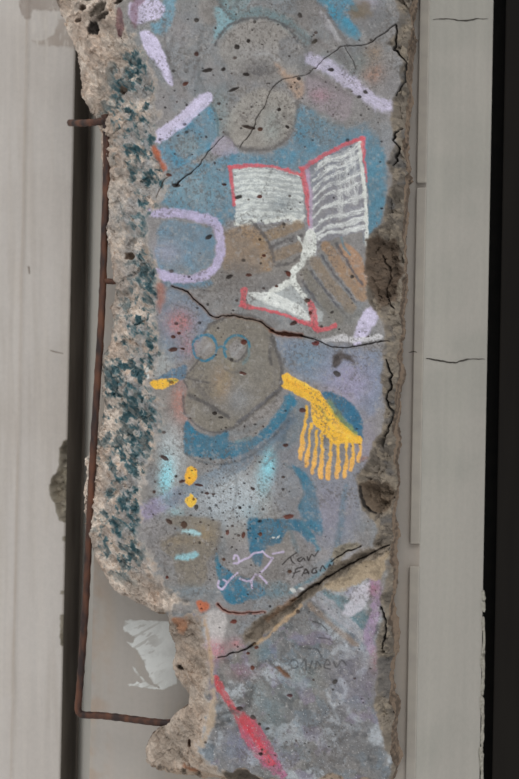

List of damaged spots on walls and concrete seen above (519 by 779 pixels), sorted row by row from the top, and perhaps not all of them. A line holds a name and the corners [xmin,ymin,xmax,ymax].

crack [433,15,487,23]
crack [409,351,485,363]